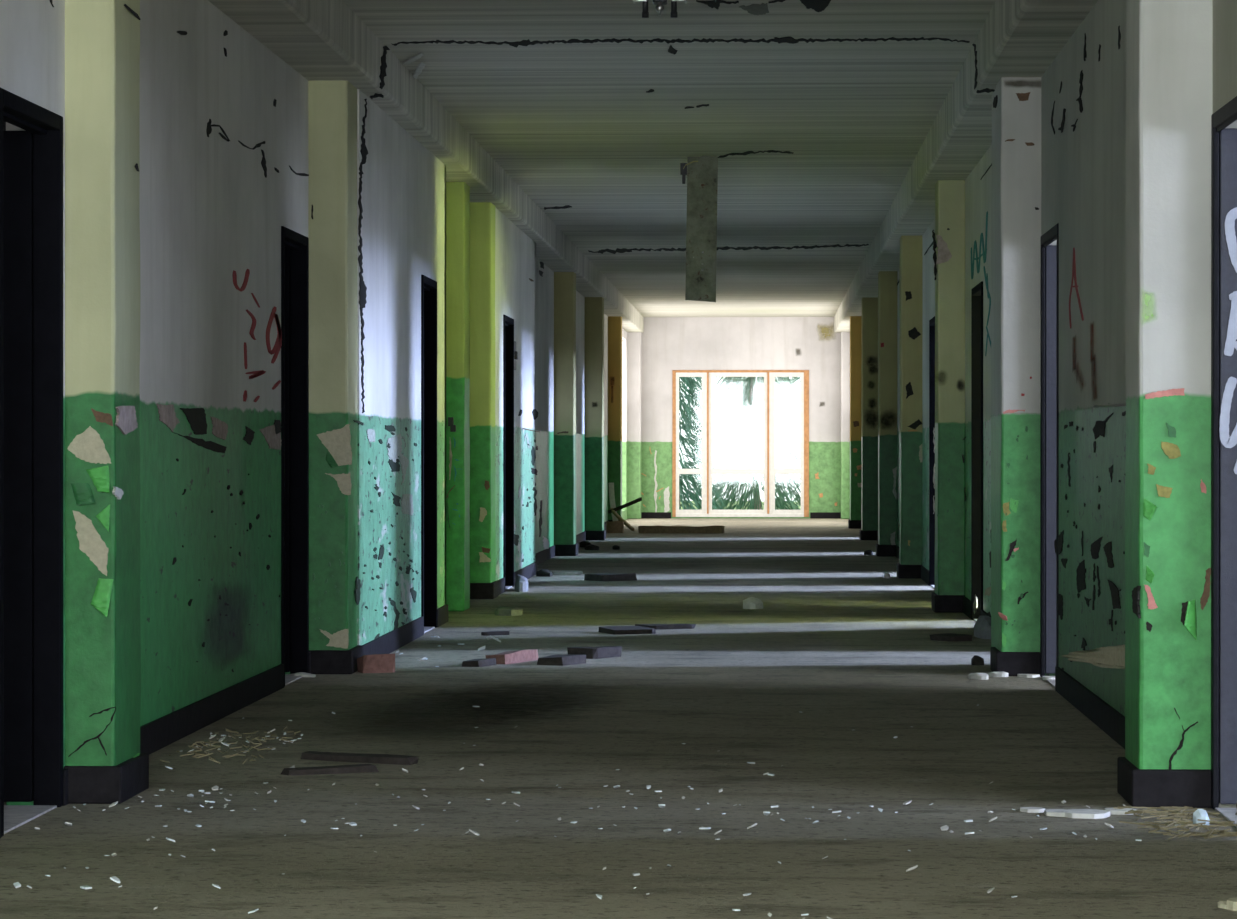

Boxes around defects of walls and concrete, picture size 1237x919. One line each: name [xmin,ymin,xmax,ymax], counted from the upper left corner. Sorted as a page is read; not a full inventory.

crack [1051,44,1086,134]
crack [358,37,998,413]
peeling [156,403,228,453]
peeling [1064,403,1126,453]
peeling [67,406,138,617]
peeling [317,420,419,639]
peeling [1054,449,1158,670]
peeling [319,629,349,649]
peeling [973,579,1020,647]
peeling [1181,568,1211,641]
crack [68,707,116,757]
crack [1168,708,1198,770]